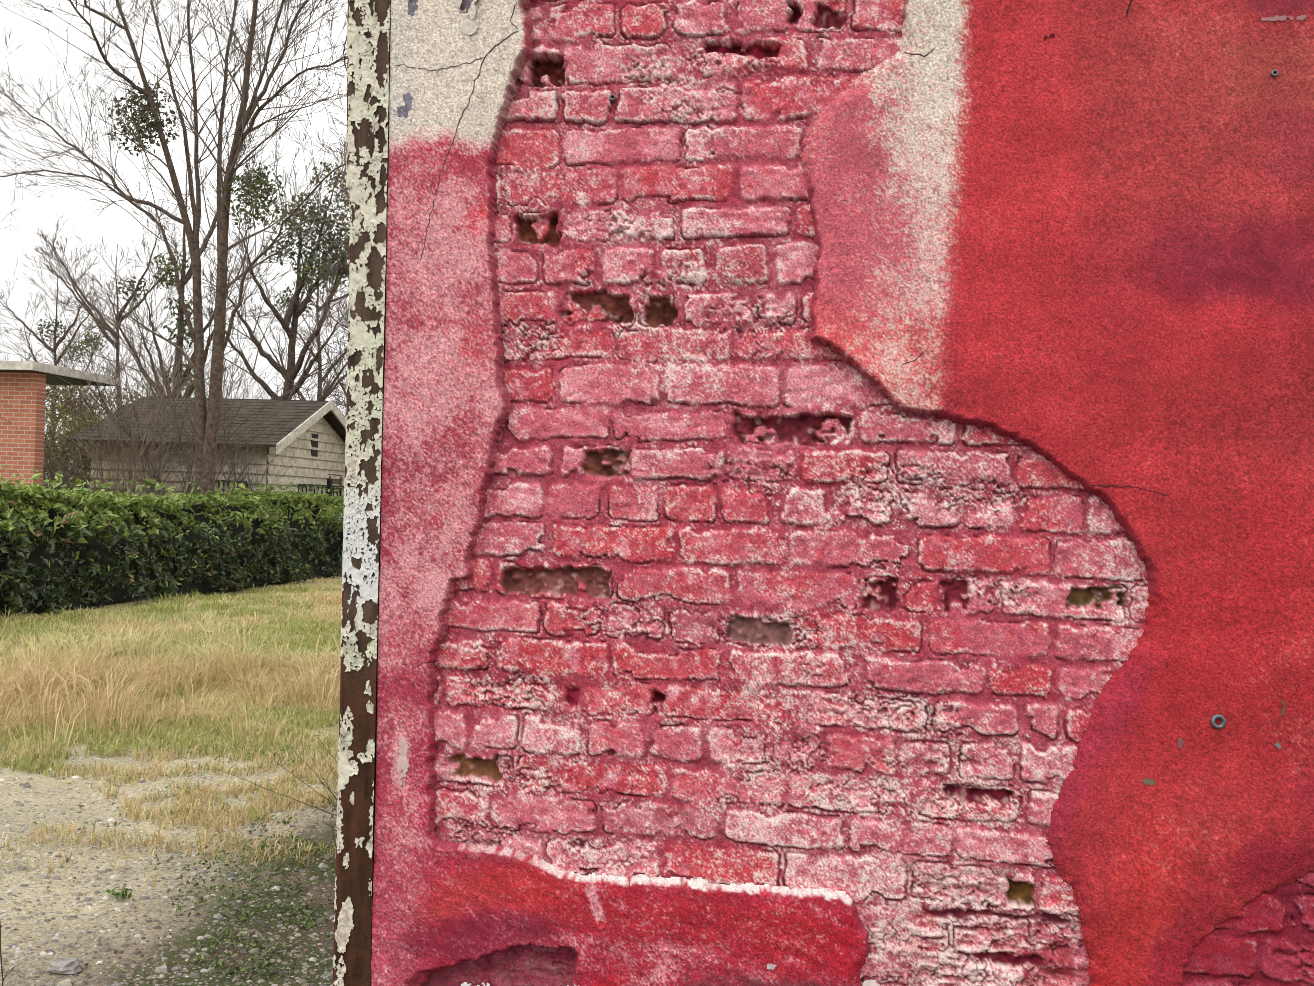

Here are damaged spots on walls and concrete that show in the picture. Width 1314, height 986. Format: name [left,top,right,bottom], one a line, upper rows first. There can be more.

peeling [333,0,415,986]
peeling [407,0,418,16]
spalling [423,0,1150,986]
spalling [1183,872,1314,986]